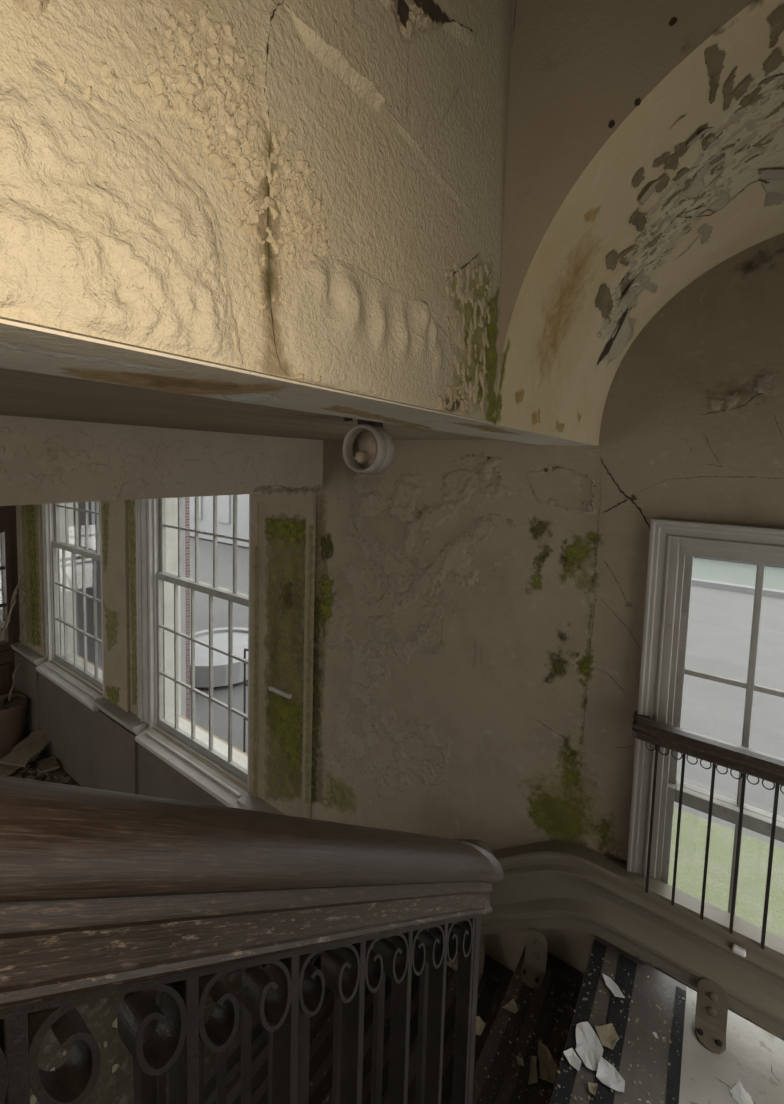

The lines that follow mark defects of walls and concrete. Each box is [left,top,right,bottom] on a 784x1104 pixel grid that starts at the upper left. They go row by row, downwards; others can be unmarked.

spalling [391,0,478,52]
crack [258,0,469,376]
peeling [595,4,784,366]
damp [0,342,282,403]
crack [601,460,784,529]